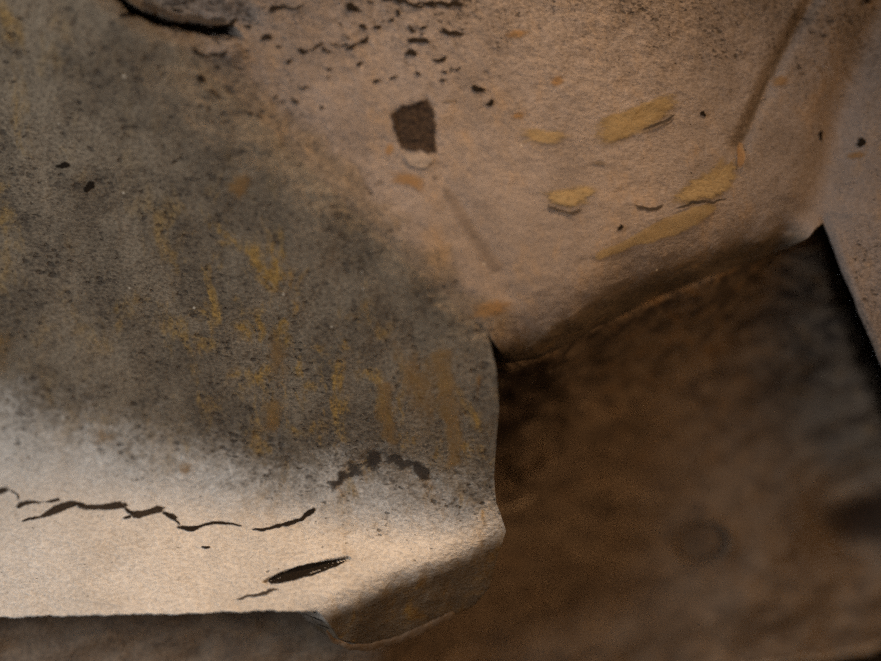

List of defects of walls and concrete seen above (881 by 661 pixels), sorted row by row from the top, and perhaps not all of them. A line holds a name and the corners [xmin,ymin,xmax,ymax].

crack [117,0,465,109]
spalling [471,84,494,106]
peeling [597,94,679,142]
spalling [386,99,436,189]
peeling [547,186,595,214]
peeling [674,143,745,209]
crack [0,487,316,532]